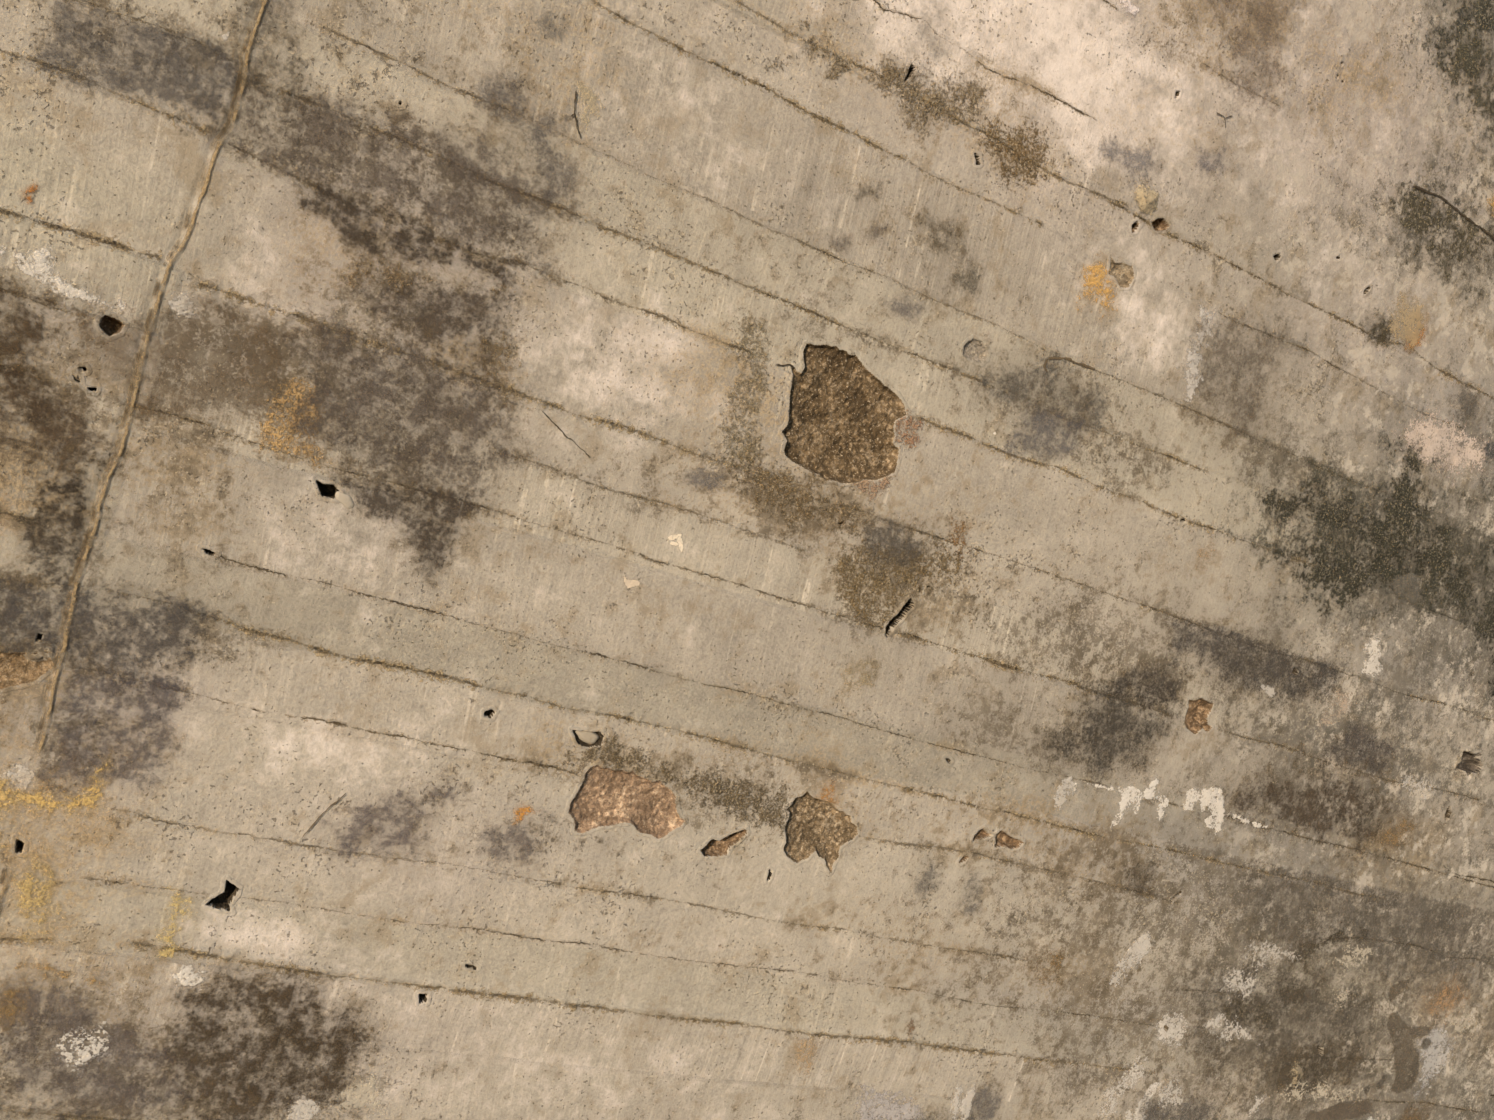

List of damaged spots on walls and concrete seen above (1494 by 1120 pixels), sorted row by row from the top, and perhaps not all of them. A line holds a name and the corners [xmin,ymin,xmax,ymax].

water stain [37,2,576,586]
spalling [778,339,910,487]
water stain [1394,410,1493,487]
spalling [0,646,59,694]
peeling [1182,695,1216,737]
water stain [1361,637,1383,677]
spalling [563,728,861,876]
water stain [0,965,385,1120]